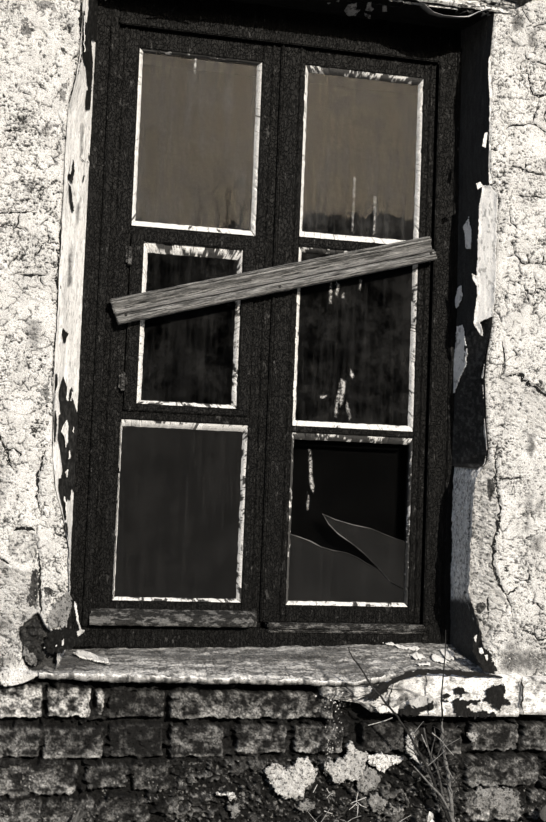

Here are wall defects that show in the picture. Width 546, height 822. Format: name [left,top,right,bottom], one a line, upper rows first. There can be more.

peeling [83,0,106,111]
peeling [482,56,492,150]
crack [506,52,546,132]
crack [20,229,63,386]
peeling [452,162,498,615]
crack [501,341,546,397]
crack [0,436,46,531]
peeling [37,374,78,540]
crack [477,442,546,641]
spalling [8,530,87,667]
peeling [367,682,511,719]
crack [347,669,546,715]